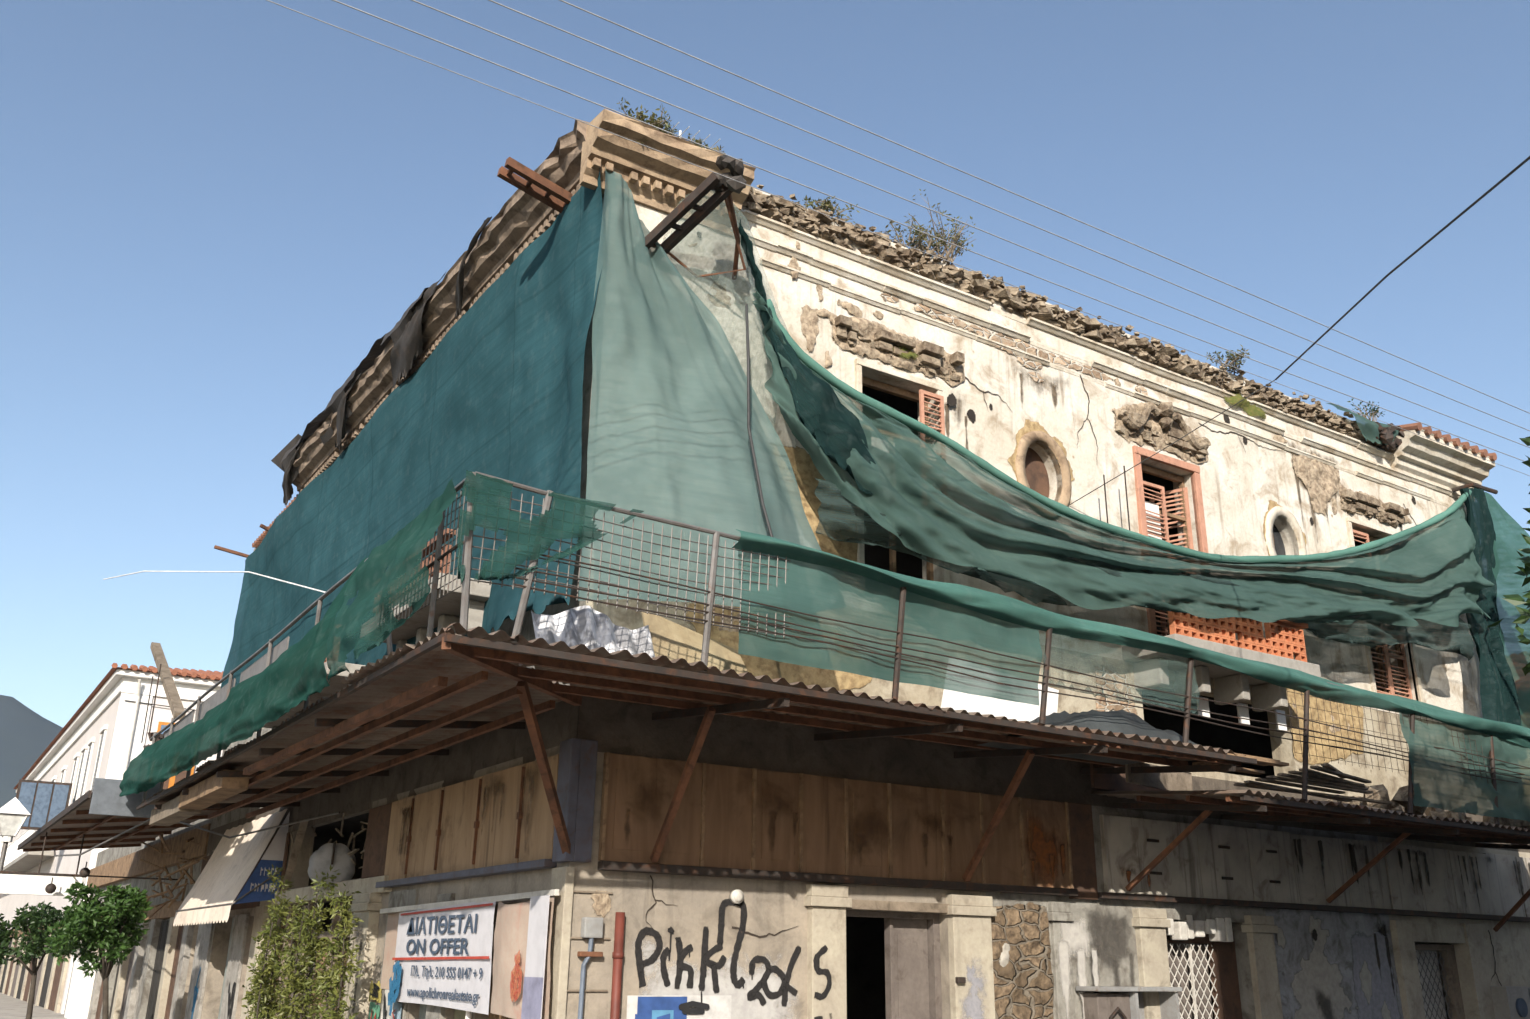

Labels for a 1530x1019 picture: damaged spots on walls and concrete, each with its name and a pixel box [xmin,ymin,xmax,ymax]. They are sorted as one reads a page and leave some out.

spalling [800,284,1208,464]
crack [1077,375,1098,453]
spalling [1263,500,1283,556]
spalling [1273,435,1384,545]
spalling [963,902,1054,1019]